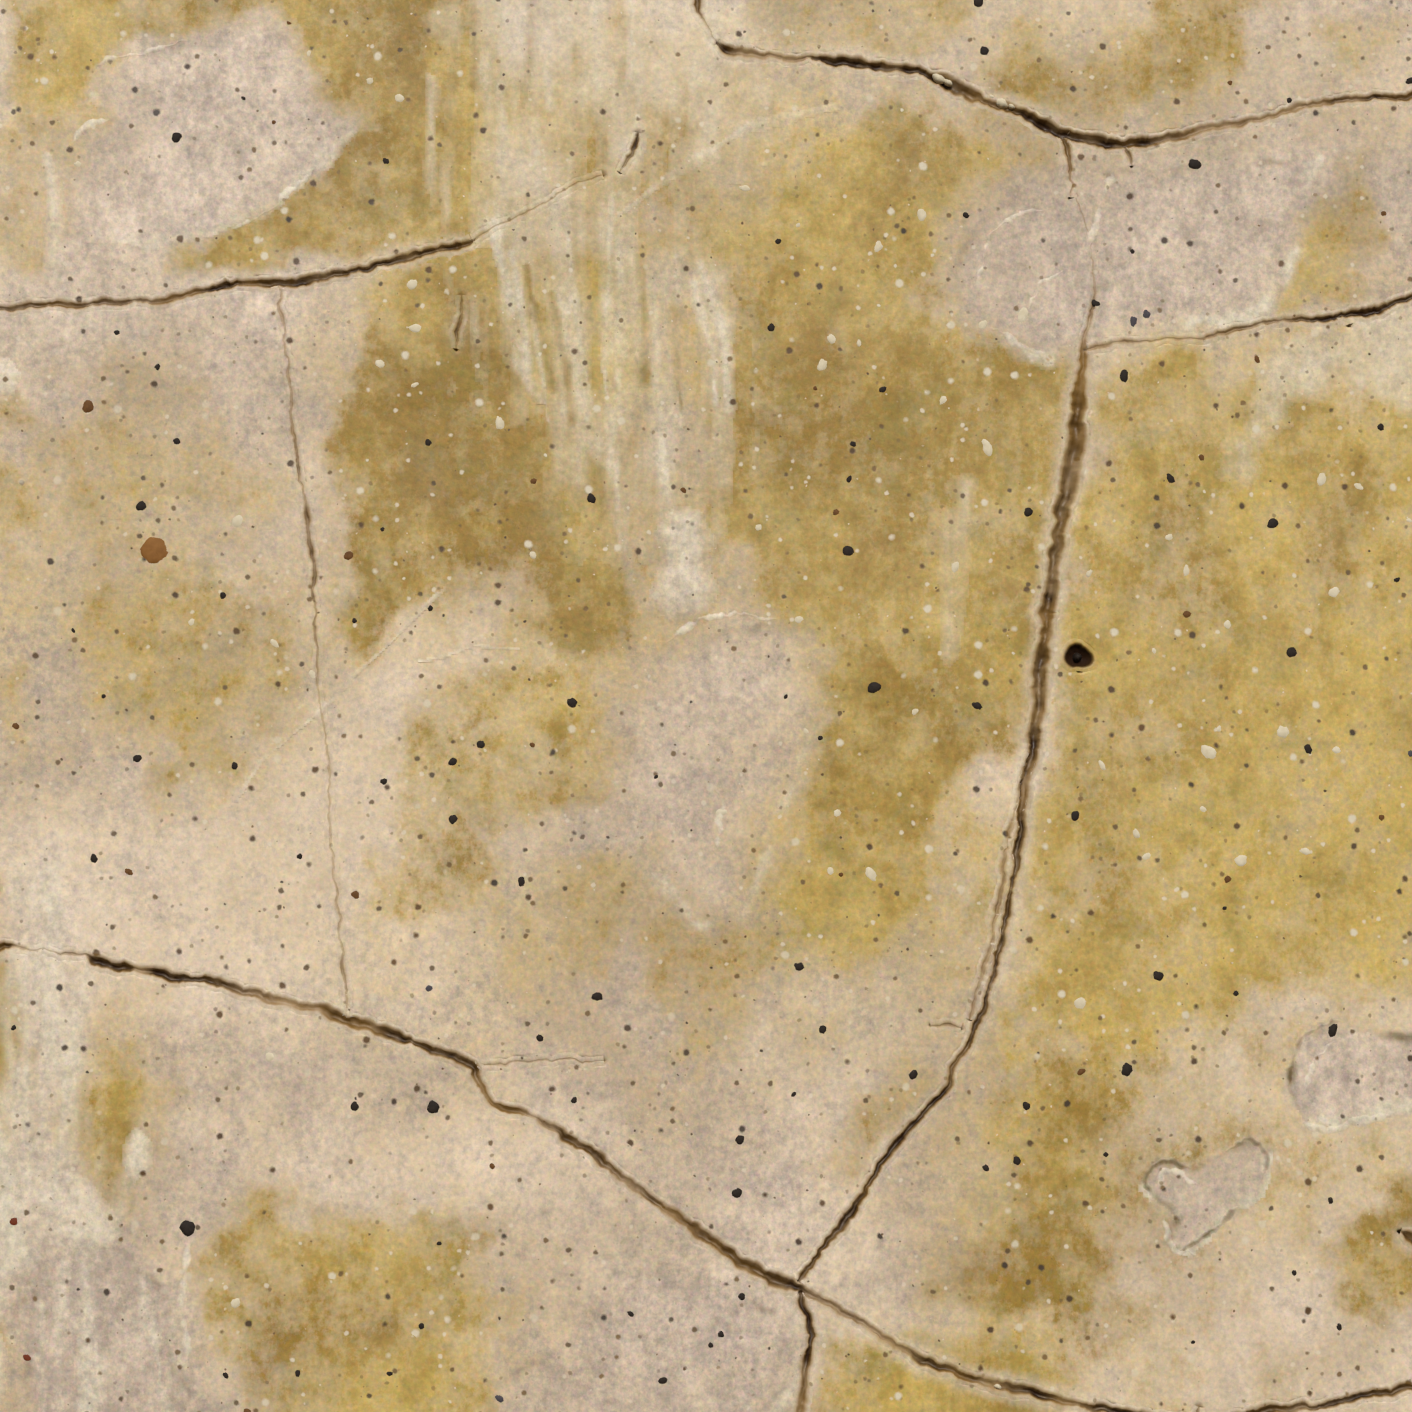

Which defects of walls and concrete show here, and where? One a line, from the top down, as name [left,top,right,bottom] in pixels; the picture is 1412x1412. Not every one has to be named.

crack [615,132,644,175]
damp [0,0,1073,1085]
crack [689,0,1412,1284]
crack [0,170,1173,1412]
damp [800,142,1412,1412]
damp [0,829,139,1412]
damp [134,1274,178,1412]
damp [177,1164,508,1412]
peeling [480,1247,801,1412]
peeling [1137,1126,1273,1259]
crack [1226,1378,1412,1412]
peeling [1283,1018,1412,1135]